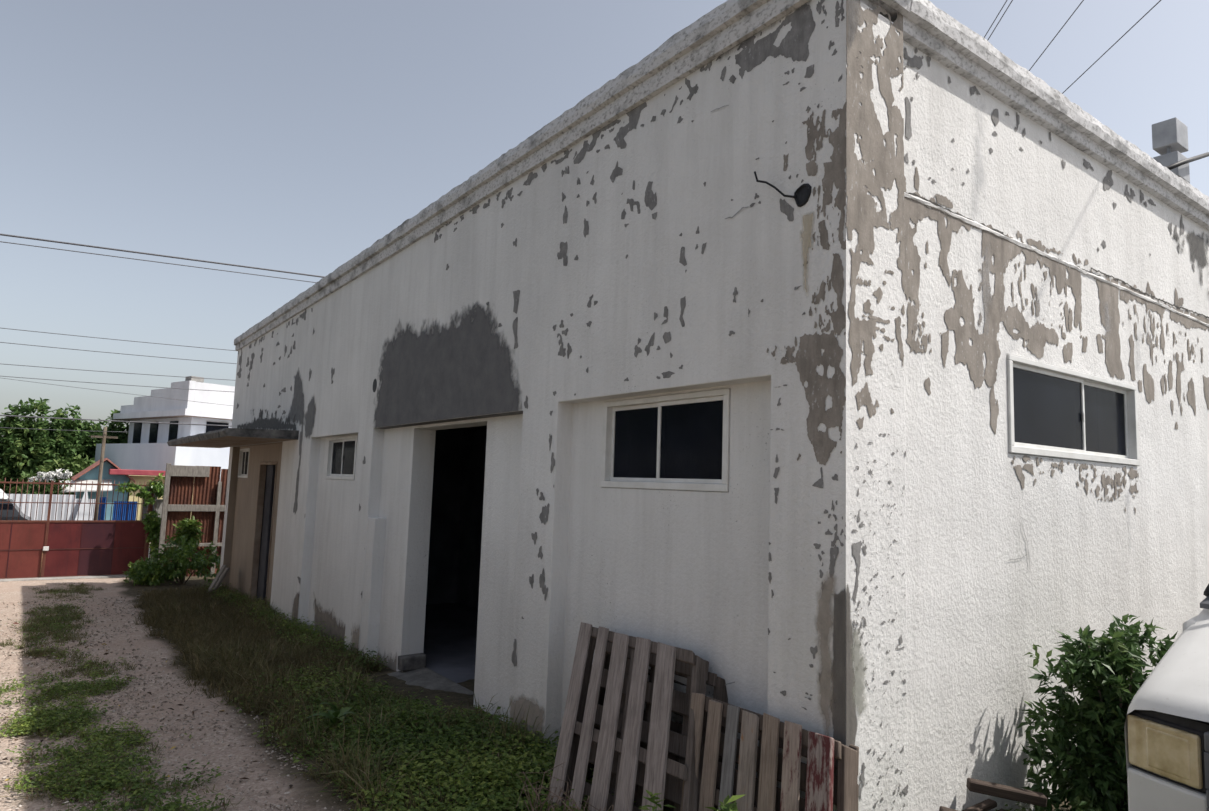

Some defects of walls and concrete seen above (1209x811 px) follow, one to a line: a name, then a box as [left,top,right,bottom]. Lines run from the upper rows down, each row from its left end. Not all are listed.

peeling [432,0,1209,488]
peeling [237,308,315,388]
peeling [293,423,303,513]
peeling [529,434,555,600]
peeling [813,450,906,655]
peeling [1012,455,1139,514]
water stain [816,577,865,747]
peeling [859,740,908,811]